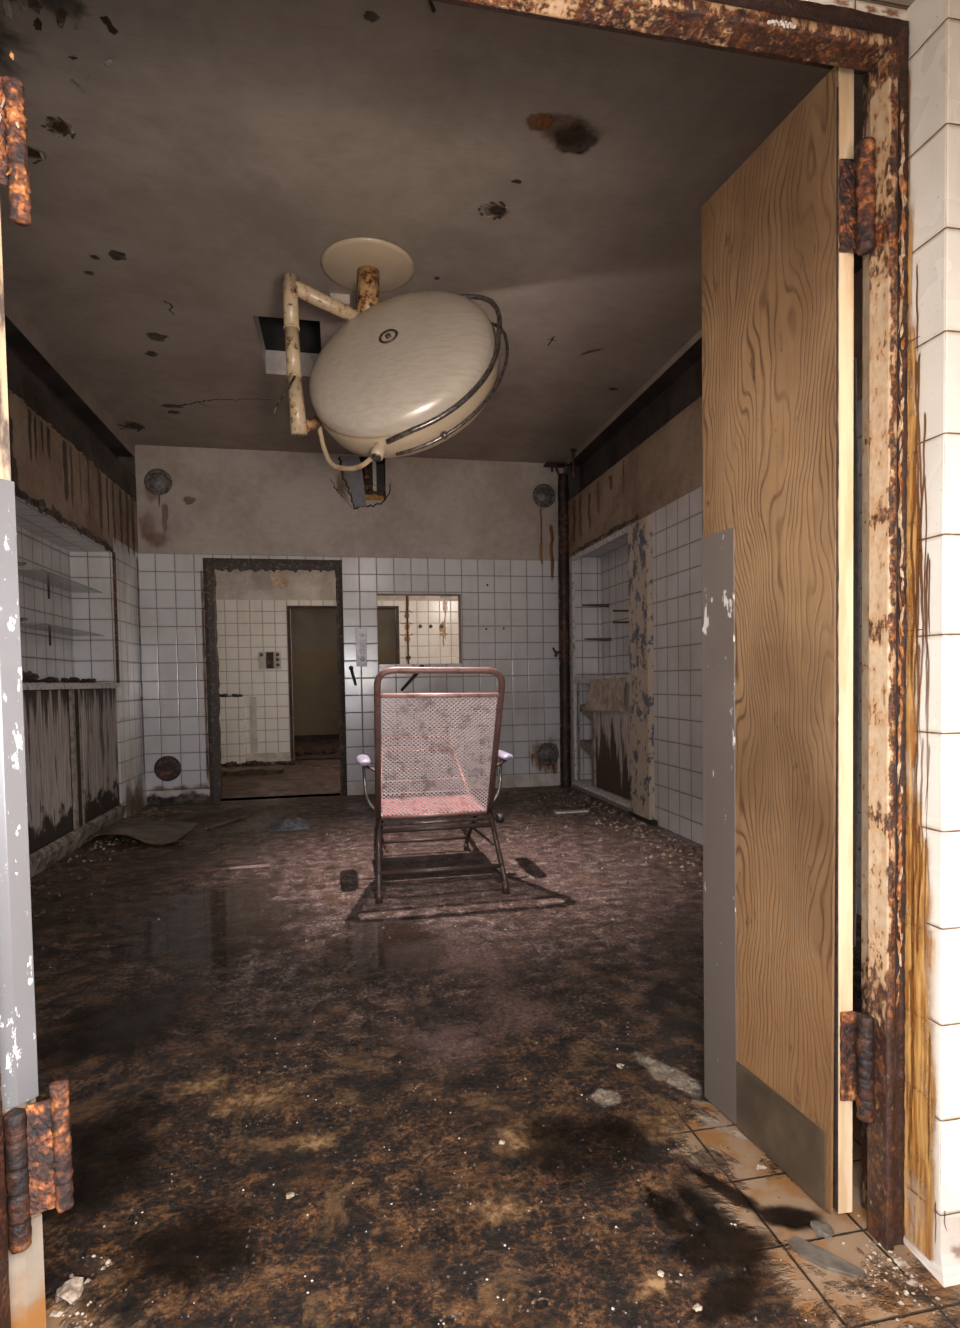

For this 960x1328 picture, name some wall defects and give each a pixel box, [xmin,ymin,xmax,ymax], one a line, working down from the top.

water stain [0,0,84,68]
water stain [100,16,118,35]
water stain [527,114,597,154]
water stain [8,391,210,817]
corrosion [903,166,935,1260]